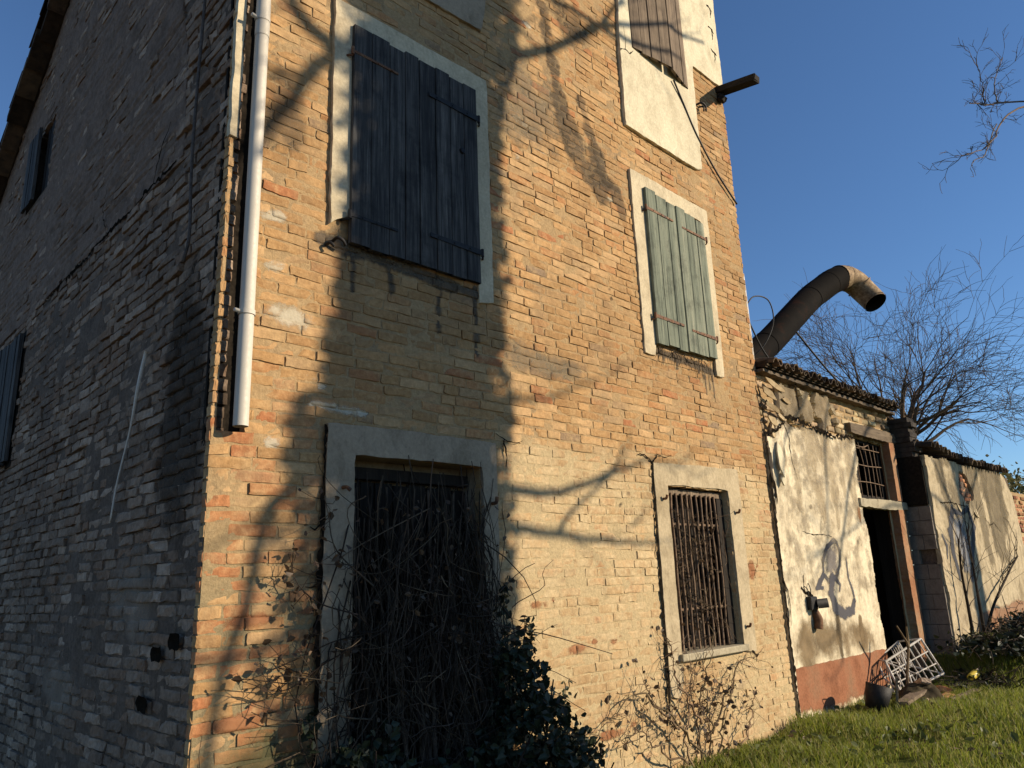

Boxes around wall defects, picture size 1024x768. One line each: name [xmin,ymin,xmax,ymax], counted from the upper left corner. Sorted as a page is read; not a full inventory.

leakage [315,232,479,356]
spalling [762,377,855,486]